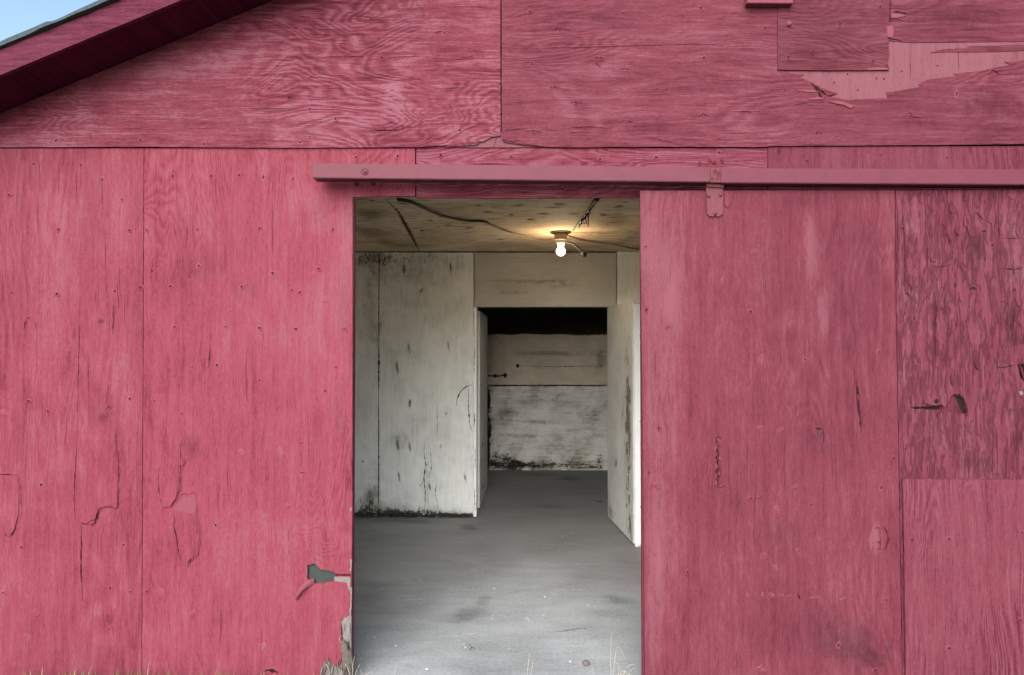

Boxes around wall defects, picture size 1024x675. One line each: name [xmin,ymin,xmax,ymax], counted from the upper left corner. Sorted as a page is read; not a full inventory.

peeling [782,41,1024,108]
crack [357,199,419,250]
crack [105,246,115,336]
crack [0,472,23,537]
crack [72,310,121,598]
crack [158,440,202,568]
damp [489,460,540,470]
spalling [320,587,355,675]